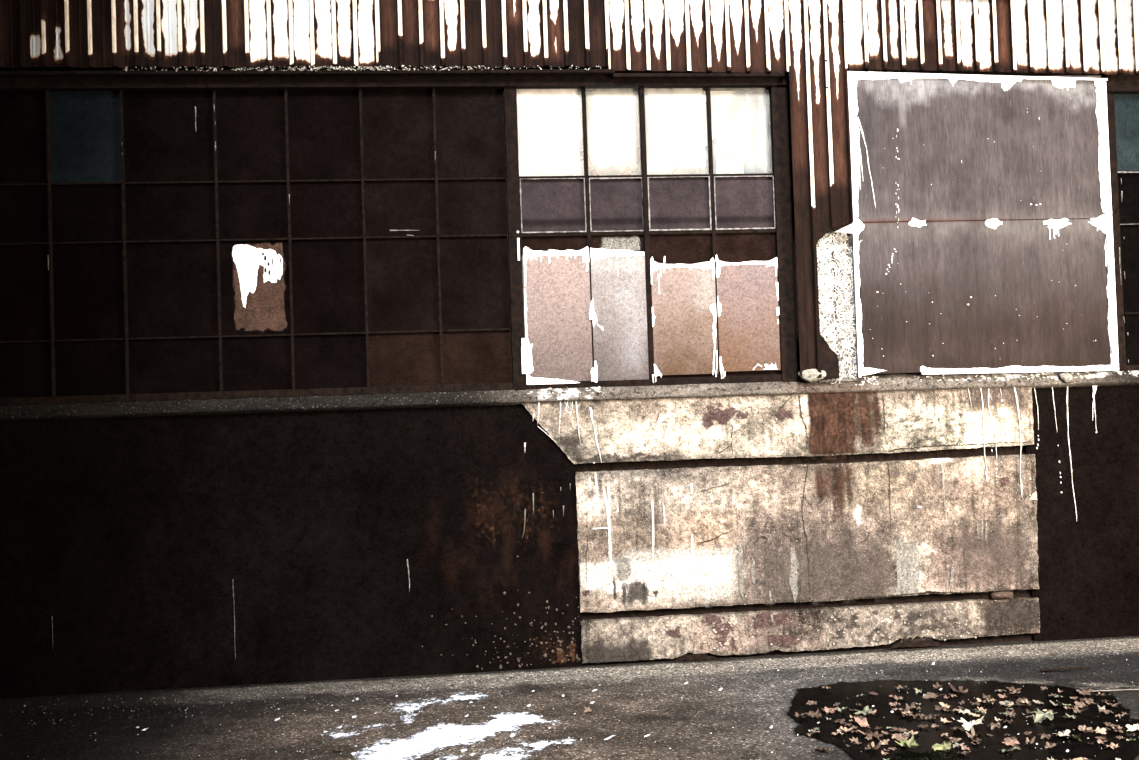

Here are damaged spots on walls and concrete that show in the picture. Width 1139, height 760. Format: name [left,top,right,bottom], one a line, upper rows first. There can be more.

peeling [232,244,283,308]
leakage [533,414,674,463]
corrosion [808,392,881,455]
leakage [592,485,618,537]
corrosion [814,470,853,517]
leakage [580,548,736,606]
leakage [766,539,919,598]
corrosion [556,644,575,663]
leakage [583,638,651,663]